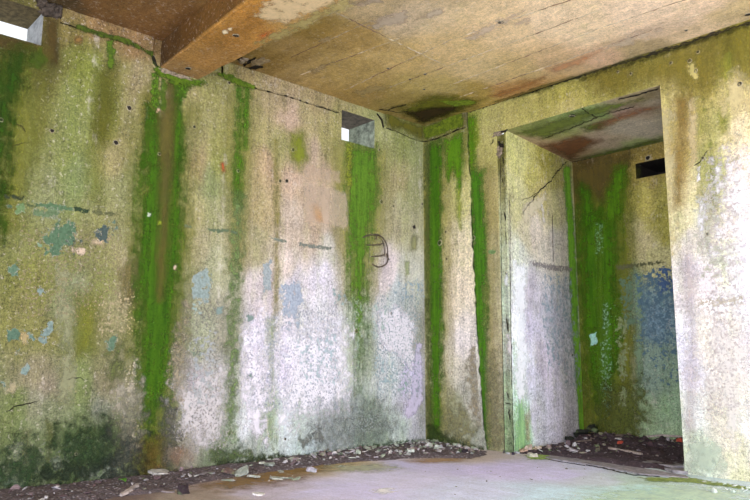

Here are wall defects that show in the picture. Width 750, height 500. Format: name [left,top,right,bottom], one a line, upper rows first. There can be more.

water stain [0,17,57,245]
peeling [4,194,139,355]
water stain [0,70,189,488]
water stain [298,116,504,455]
crack [471,204,514,452]
crack [500,152,617,214]
water stain [573,152,651,436]